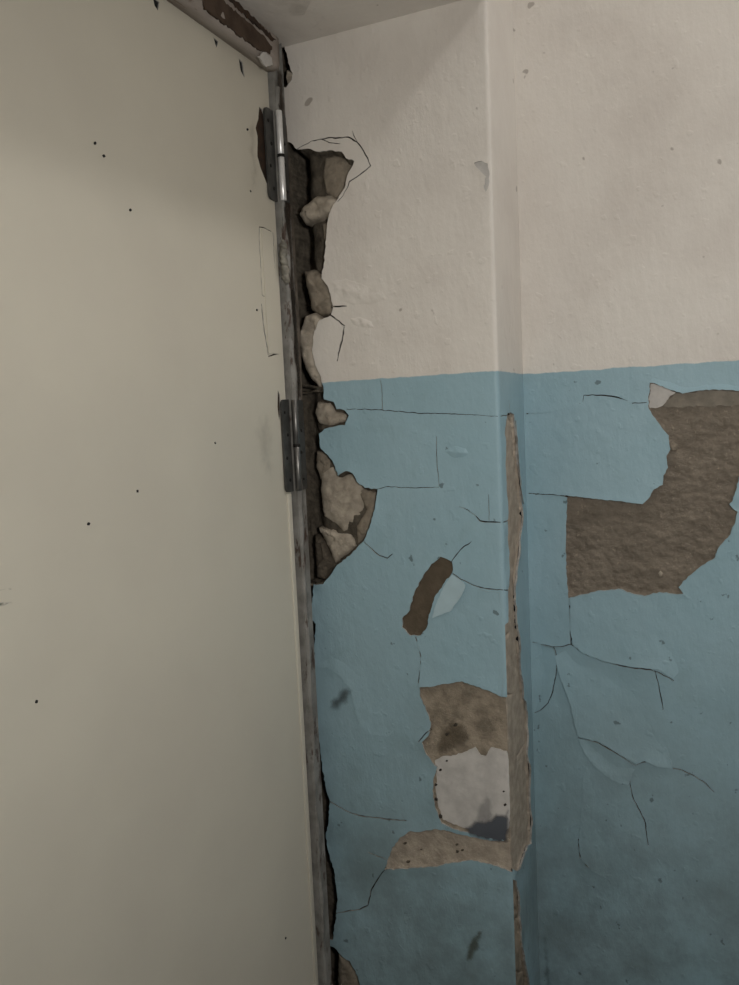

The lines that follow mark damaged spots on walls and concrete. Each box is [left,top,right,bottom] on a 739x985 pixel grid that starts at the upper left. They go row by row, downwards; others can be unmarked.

crack [297,136,371,182]
spalling [288,142,377,586]
spalling [385,413,530,985]
spalling [528,383,739,769]
spalling [330,946,360,985]